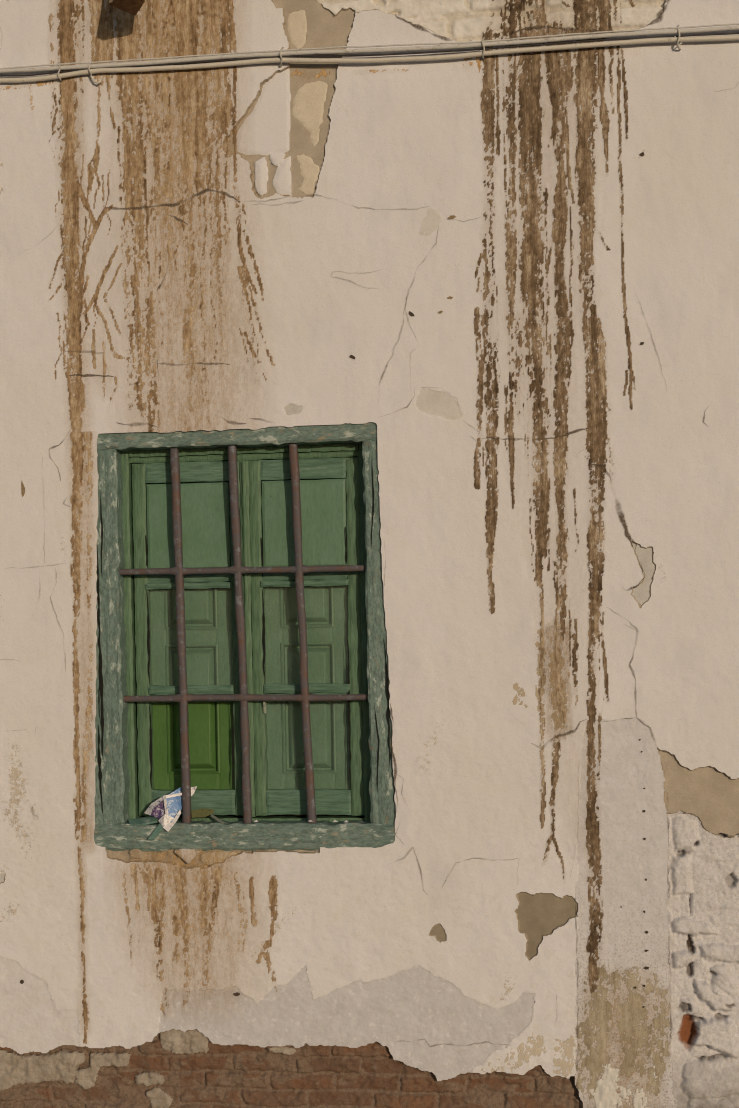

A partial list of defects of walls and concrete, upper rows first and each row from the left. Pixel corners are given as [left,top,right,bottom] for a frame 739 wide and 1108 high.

spalling [222,0,666,199]
peeling [415,389,463,420]
damp [48,0,278,1044]
damp [473,0,670,1100]
flaking render [630,541,660,608]
spalling [105,847,320,869]
spalling [429,923,447,943]
spalling [515,892,578,961]
spalling [657,748,739,1108]
spalling [0,956,649,1108]